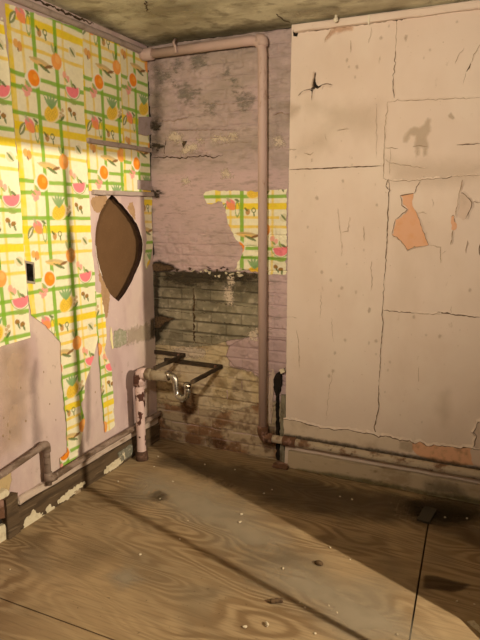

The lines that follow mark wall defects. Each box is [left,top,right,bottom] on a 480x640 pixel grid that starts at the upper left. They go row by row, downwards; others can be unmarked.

crack [152,101,249,159]
spalling [91,195,143,318]
crack [288,20,480,433]
peeling [391,191,431,252]
peeling [267,368,480,467]
peeling [104,452,125,474]
peeling [23,481,85,528]